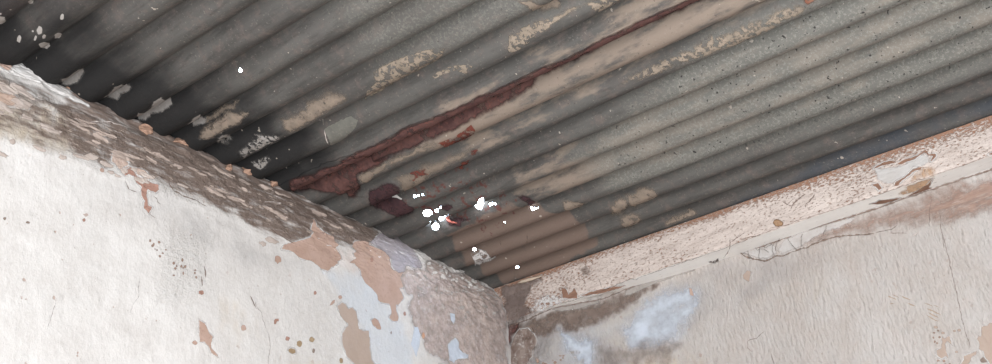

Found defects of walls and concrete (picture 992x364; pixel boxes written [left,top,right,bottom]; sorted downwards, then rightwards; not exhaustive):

flaking render [0,63,90,135]
peeling [137,97,172,120]
peeling [189,101,248,143]
peeling [240,92,346,169]
peeling [365,48,472,100]
corrosion [290,0,699,217]
peeling [508,0,619,53]
peeling [626,7,804,82]
flaking render [59,118,291,220]
flaking render [744,150,992,258]
spalling [259,209,564,364]
water stain [521,290,697,364]